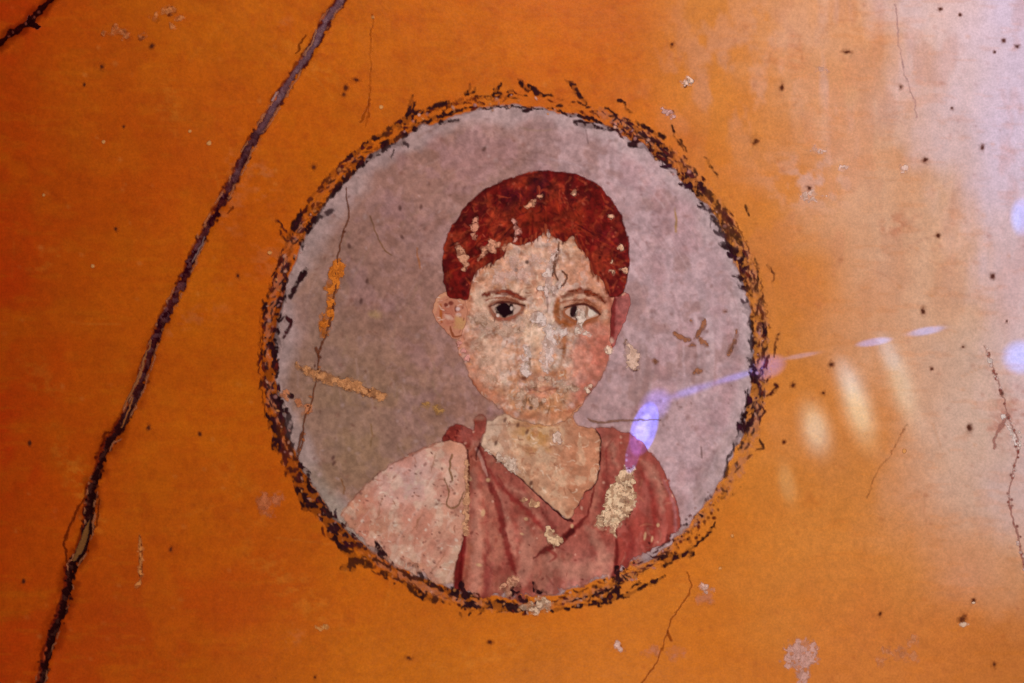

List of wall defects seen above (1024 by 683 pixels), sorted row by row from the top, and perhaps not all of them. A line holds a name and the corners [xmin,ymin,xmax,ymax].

crack [0,0,54,47]
peeling [457,217,562,297]
peeling [319,258,346,338]
crack [35,0,350,683]
peeling [295,362,387,401]
peeling [475,309,593,412]
flaking render [596,465,636,537]
crack [987,352,1024,570]